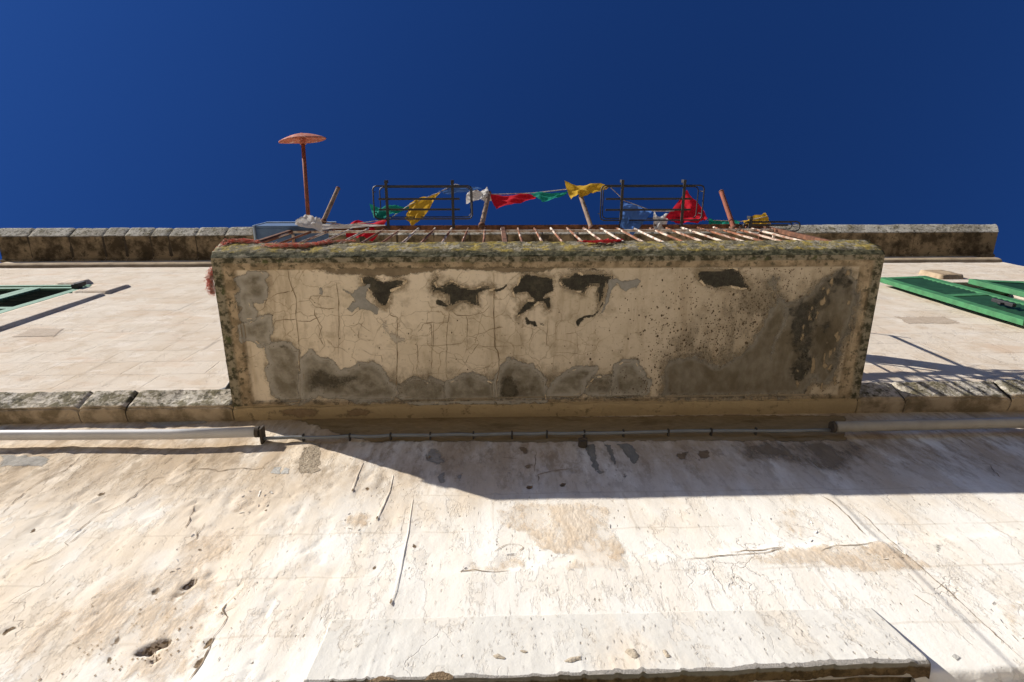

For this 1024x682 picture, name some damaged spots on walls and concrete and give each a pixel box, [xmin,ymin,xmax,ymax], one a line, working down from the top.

crack [260,272,600,397]
peeling [233,268,652,406]
leakage [576,267,861,401]
peeling [694,267,751,290]
crack [686,547,780,560]